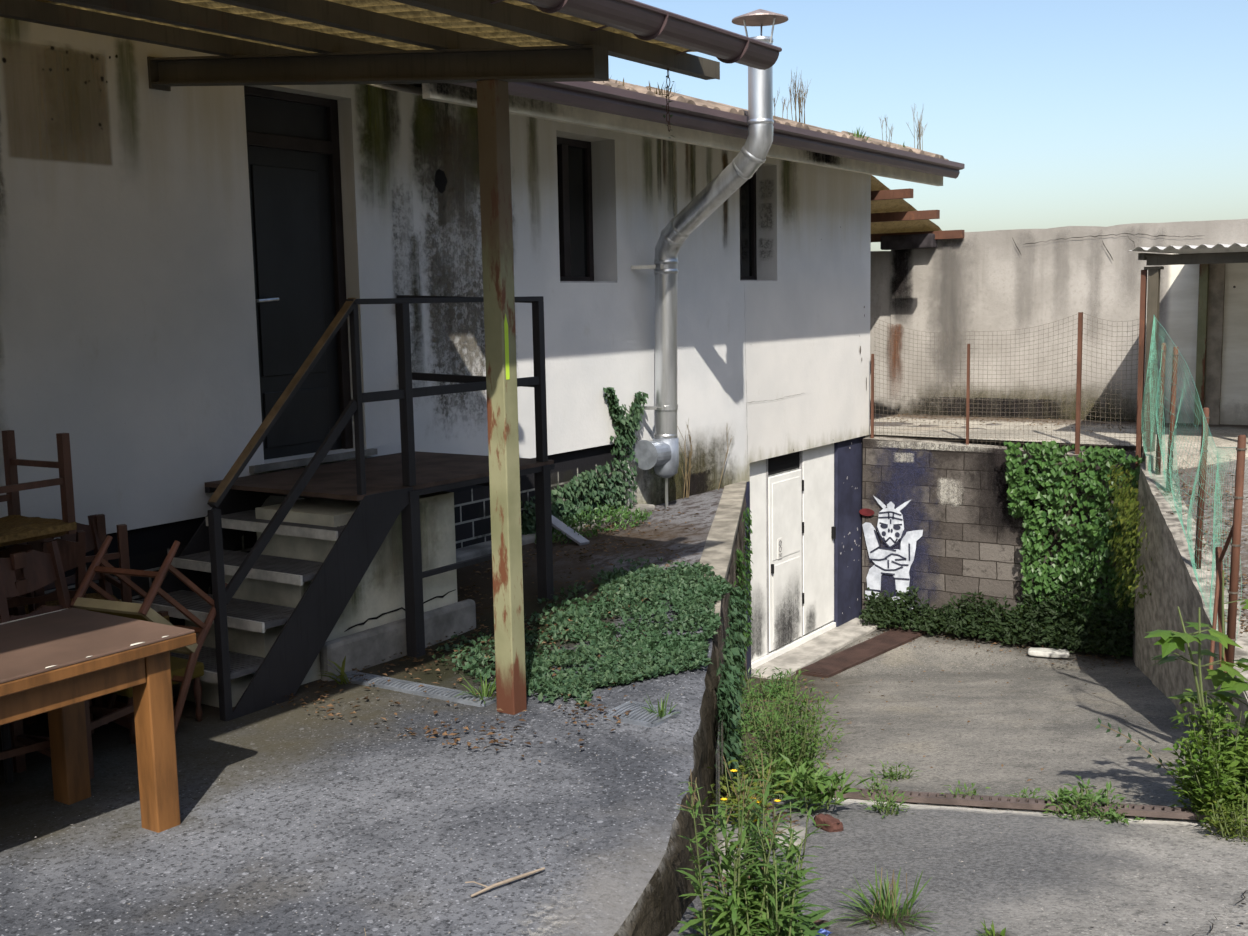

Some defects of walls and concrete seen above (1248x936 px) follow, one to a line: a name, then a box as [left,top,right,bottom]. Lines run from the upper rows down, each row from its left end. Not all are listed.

damp [360,84,399,164]
damp [645,139,695,214]
damp [807,151,837,163]
damp [393,83,484,415]
damp [891,249,912,314]
crack [1192,890,1248,936]